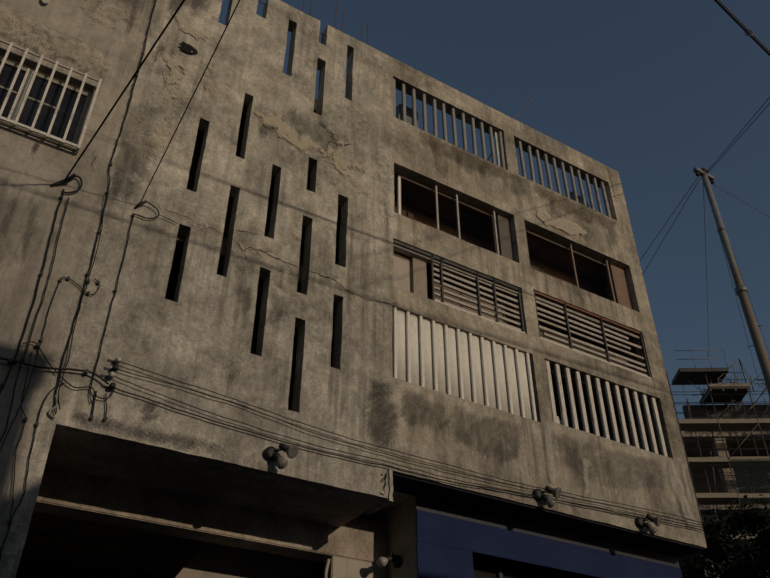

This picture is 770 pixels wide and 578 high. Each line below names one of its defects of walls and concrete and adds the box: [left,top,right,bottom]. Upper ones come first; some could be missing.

spalling [163,42,199,84]
spalling [254,111,316,151]
spalling [537,209,587,235]
crack [236,230,390,304]